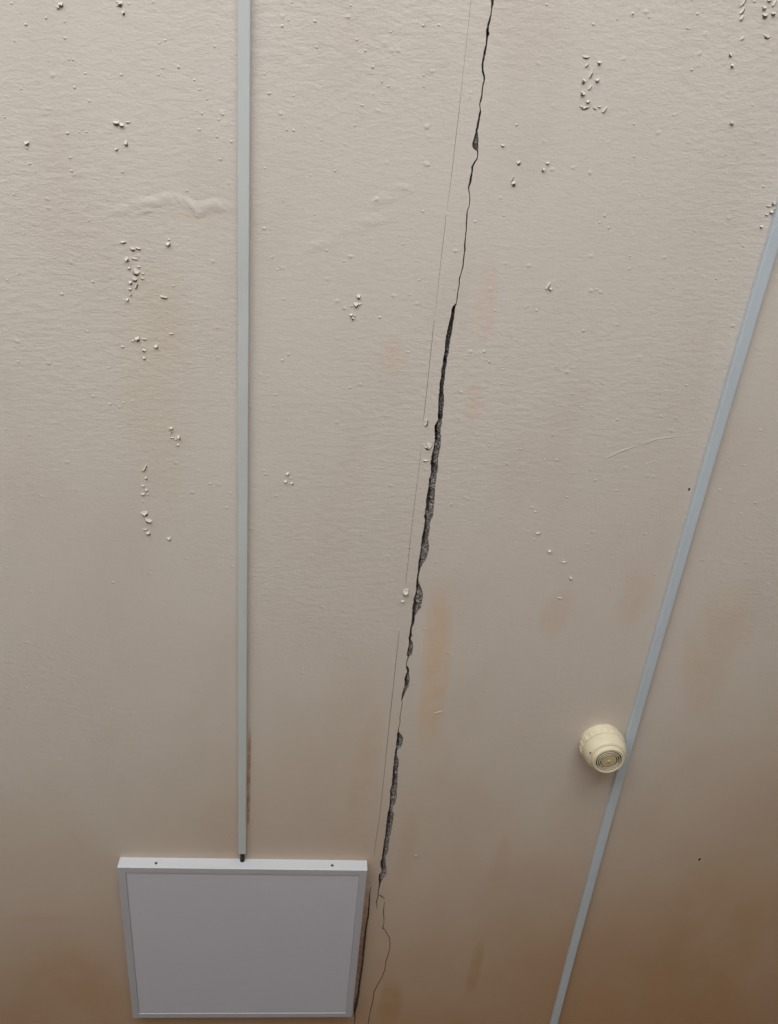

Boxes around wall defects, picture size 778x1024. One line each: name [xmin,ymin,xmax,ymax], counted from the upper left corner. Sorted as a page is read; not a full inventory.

peeling [121,241,145,302]
crack [354,0,494,1024]